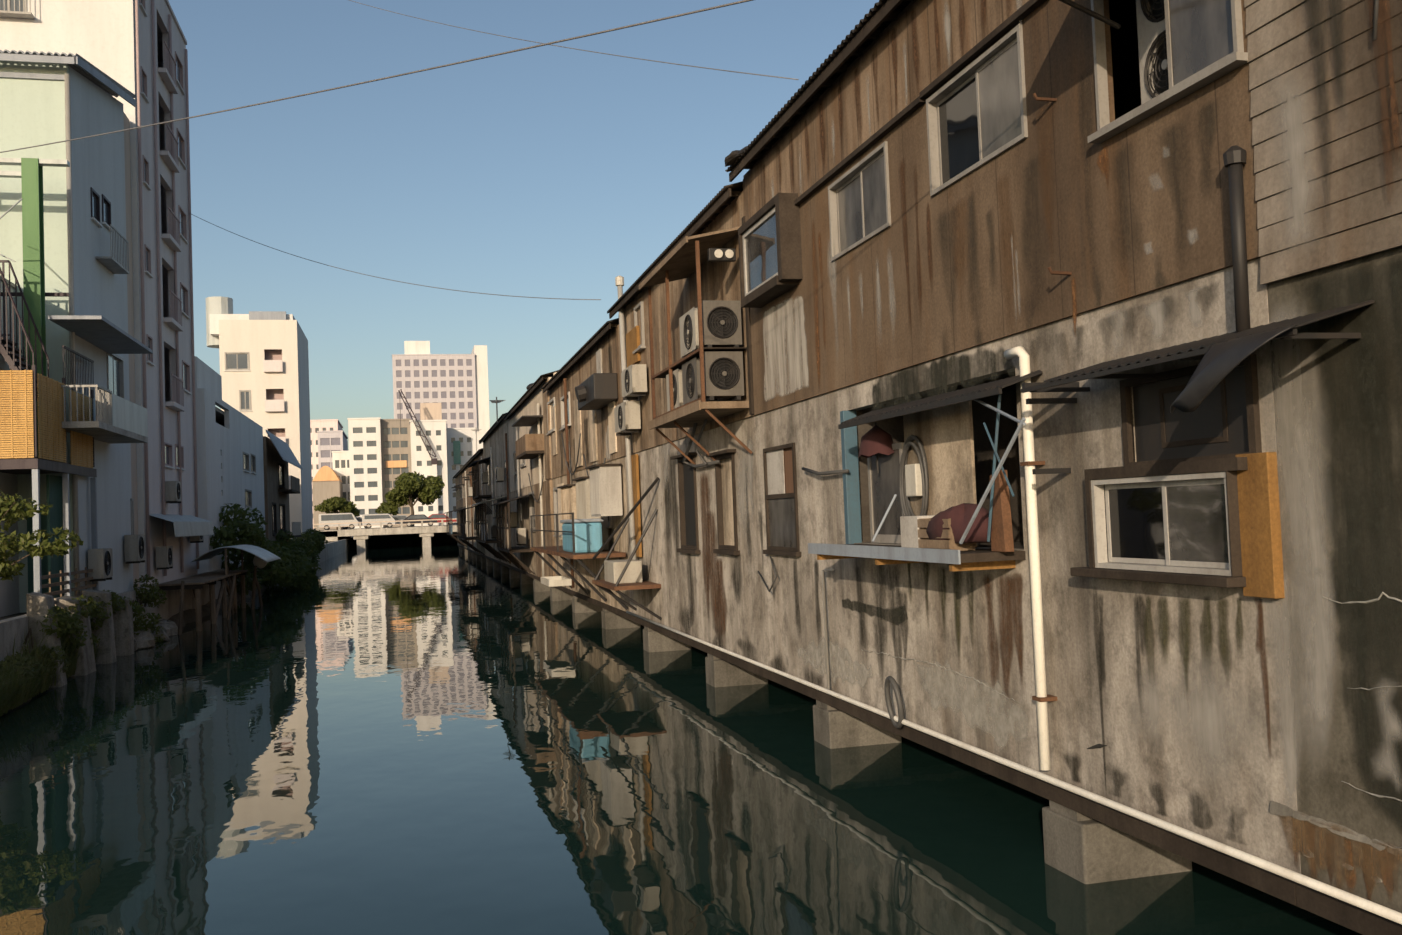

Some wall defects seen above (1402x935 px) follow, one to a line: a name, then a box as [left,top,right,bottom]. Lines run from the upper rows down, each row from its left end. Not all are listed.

damp [1308,0,1344,147]
damp [1286,92,1308,232]
rust [984,575,1023,686]
damp [1095,608,1121,796]
damp [1135,597,1243,760]
damp [1269,259,1402,828]
crack [1324,592,1402,604]
crack [1350,684,1402,692]
damp [1066,757,1080,782]
damp [1153,787,1165,816]
damp [1193,799,1210,828]
crack [1342,781,1402,802]